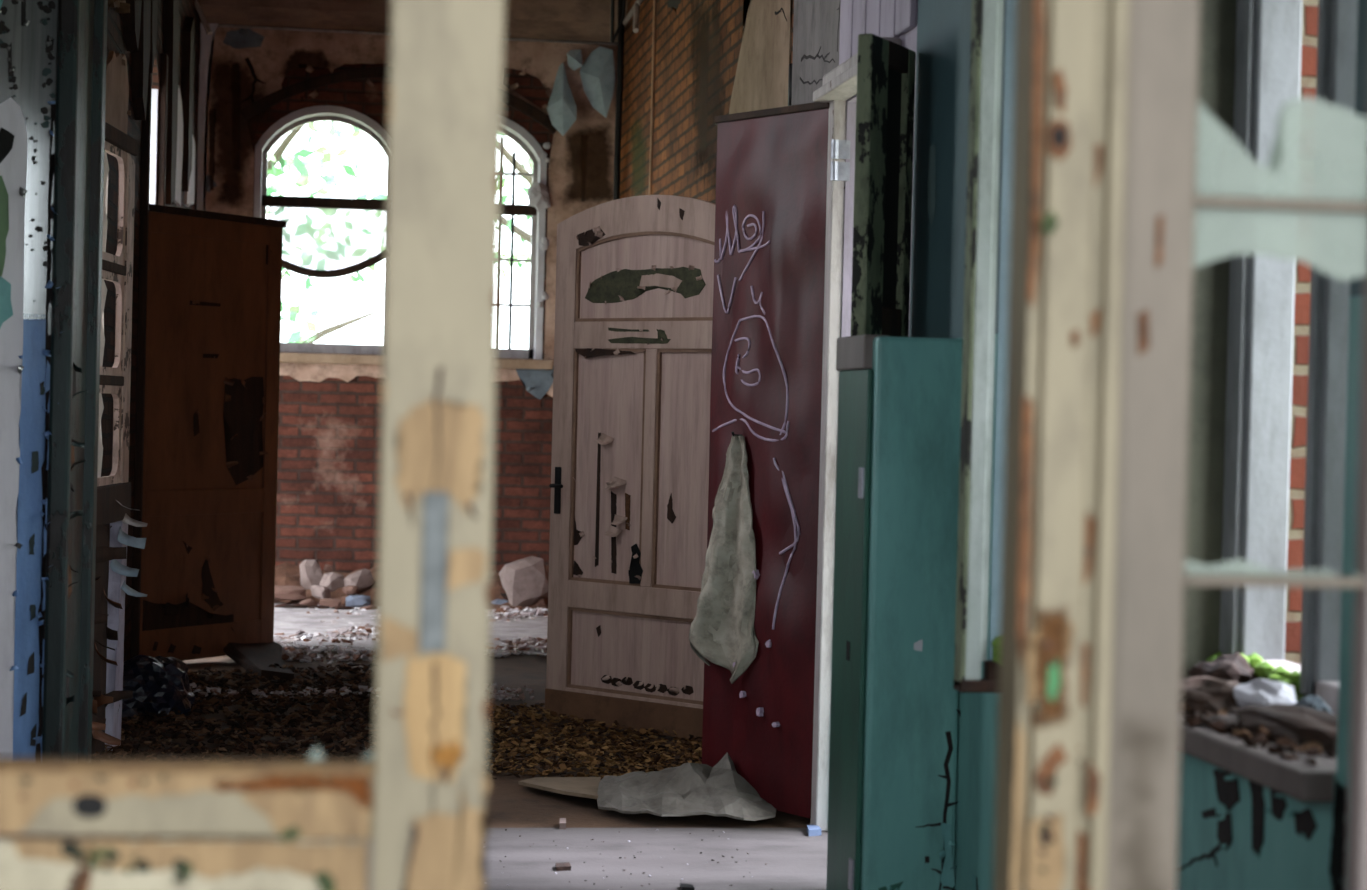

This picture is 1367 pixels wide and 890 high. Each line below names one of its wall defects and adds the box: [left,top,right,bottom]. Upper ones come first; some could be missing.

peeling [503,46,615,163]
peeling [527,182,551,213]
peeling [0,0,88,757]
peeling [446,547,492,608]
crack [916,731,978,890]
peeling [1201,767,1318,859]
peeling [9,838,367,890]